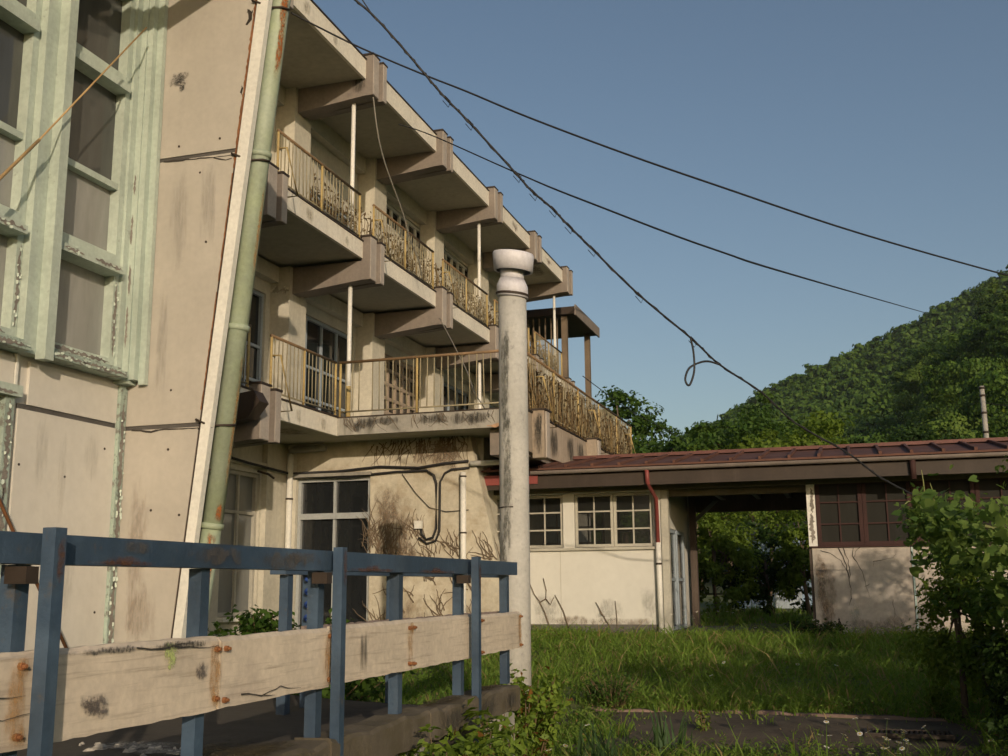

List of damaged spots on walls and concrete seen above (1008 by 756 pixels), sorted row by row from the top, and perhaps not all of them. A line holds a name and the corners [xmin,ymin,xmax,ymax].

corrosion [276,0,288,69]
peeling [54,258,131,375]
peeling [0,387,17,531]
leakage [501,453,511,562]